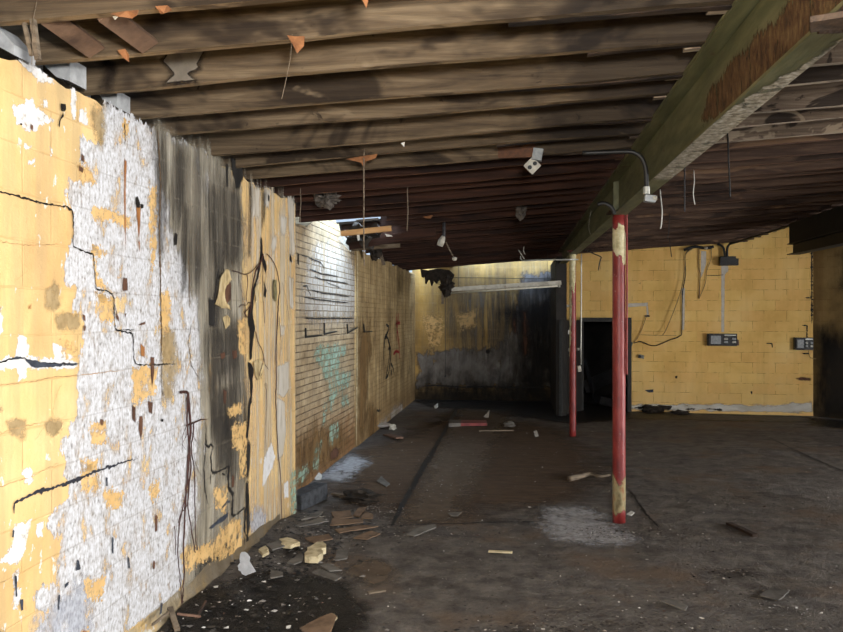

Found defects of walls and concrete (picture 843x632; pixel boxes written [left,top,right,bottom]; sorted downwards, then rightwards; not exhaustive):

peeling [19,58,54,85]
peeling [251,184,270,218]
peeling [271,196,299,265]
crack [0,191,200,440]
peeling [0,87,265,632]
water stain [156,130,266,572]
crack [210,237,267,438]
water stain [421,282,550,360]
crack [0,458,138,512]
peeling [262,362,289,486]
peeling [284,400,339,498]